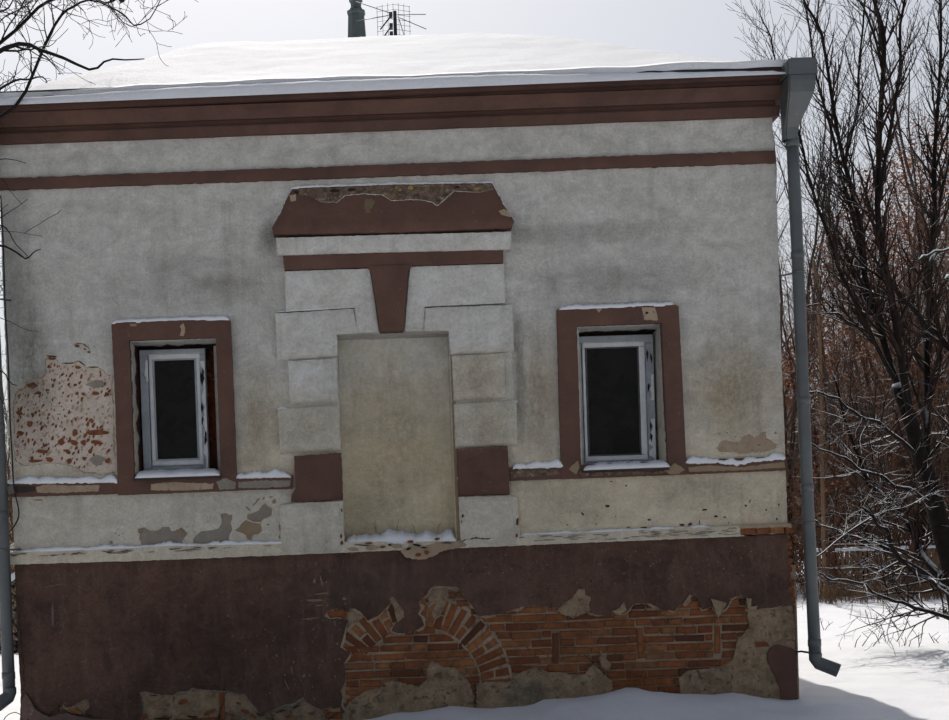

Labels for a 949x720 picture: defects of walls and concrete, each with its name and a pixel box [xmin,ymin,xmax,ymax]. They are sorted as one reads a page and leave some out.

spalling [290,183,494,213]
flaking render [7,343,116,501]
spalling [138,347,291,552]
peeling [510,431,785,478]
spalling [140,523,799,720]